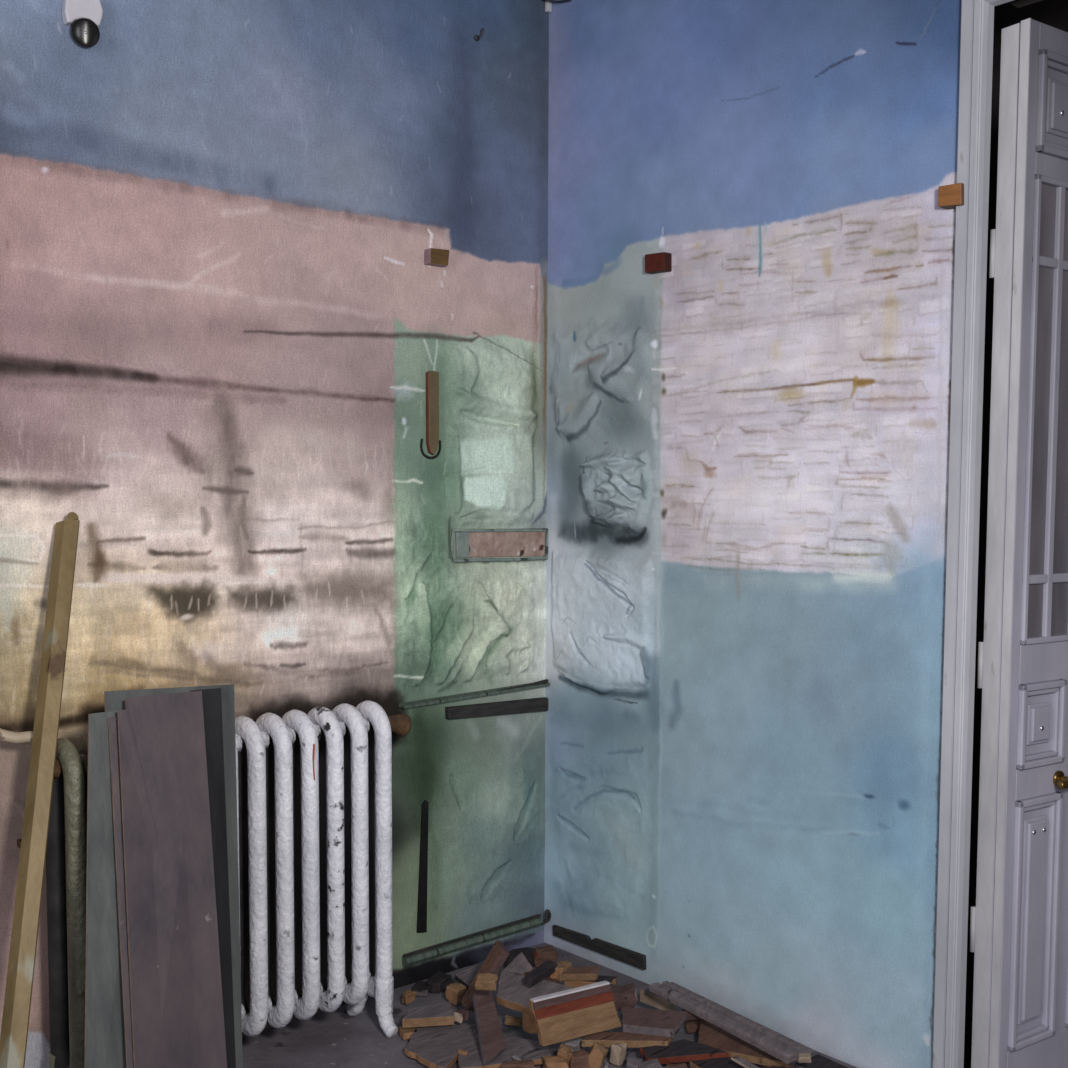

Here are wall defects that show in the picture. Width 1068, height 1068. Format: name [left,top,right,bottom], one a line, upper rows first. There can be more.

crack [814,0,943,78]
water stain [0,371,65,395]
water stain [531,190,955,580]
peeling [943,342,952,549]
water stain [0,481,57,639]
water stain [75,580,109,590]
water stain [104,371,426,689]
water stain [483,597,499,614]
water stain [418,614,472,694]
water stain [475,623,515,688]